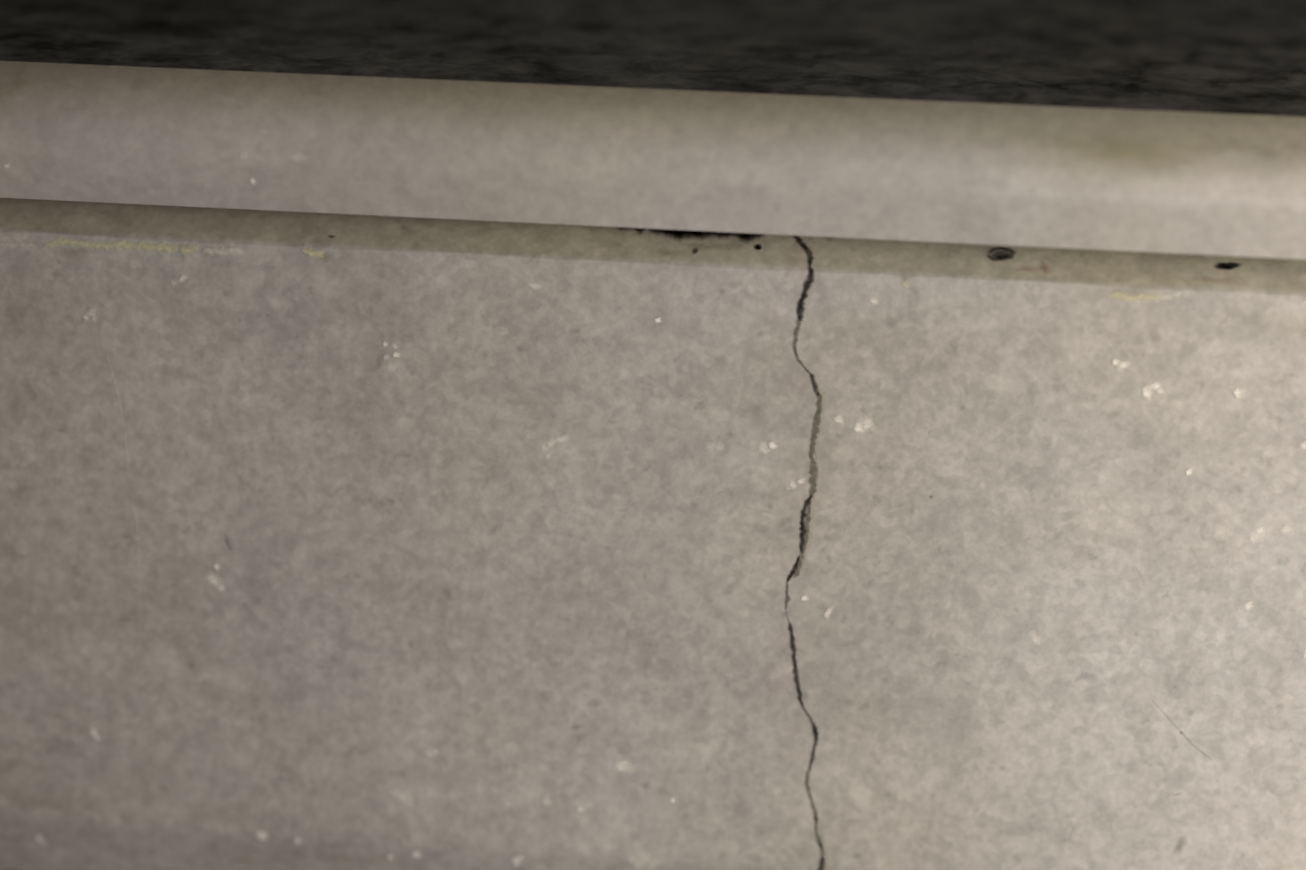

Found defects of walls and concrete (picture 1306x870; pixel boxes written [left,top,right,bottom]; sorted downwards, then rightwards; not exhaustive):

crack [785,235,824,870]